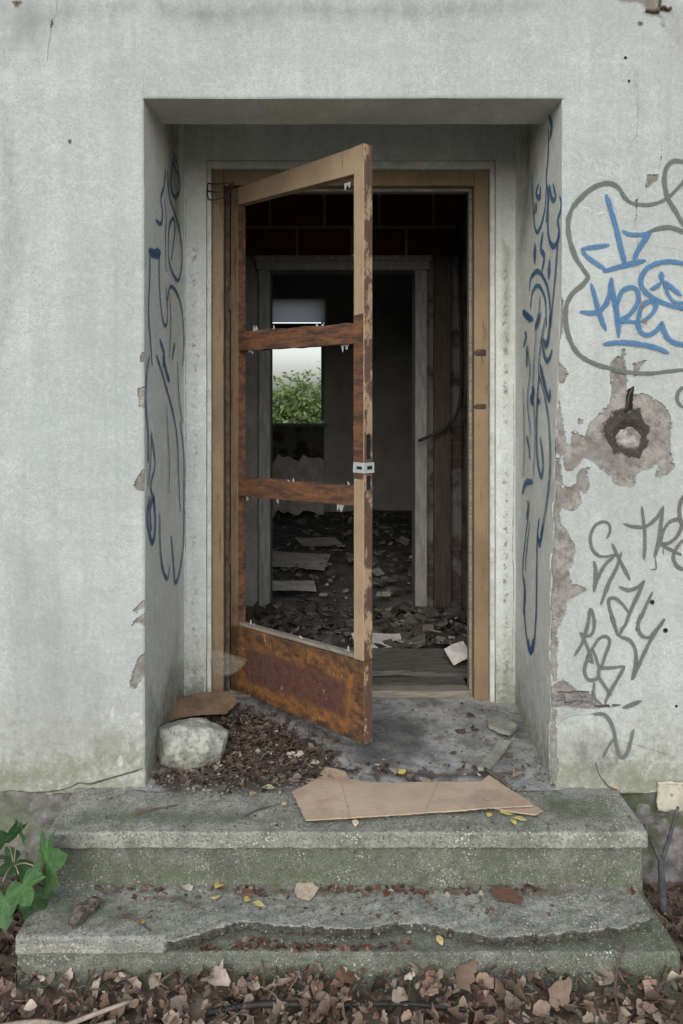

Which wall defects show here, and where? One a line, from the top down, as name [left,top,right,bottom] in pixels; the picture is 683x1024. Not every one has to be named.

peeling [132,471,144,491]
flaking render [550,348,675,784]
peeling [131,600,145,626]
peeling [128,654,145,689]